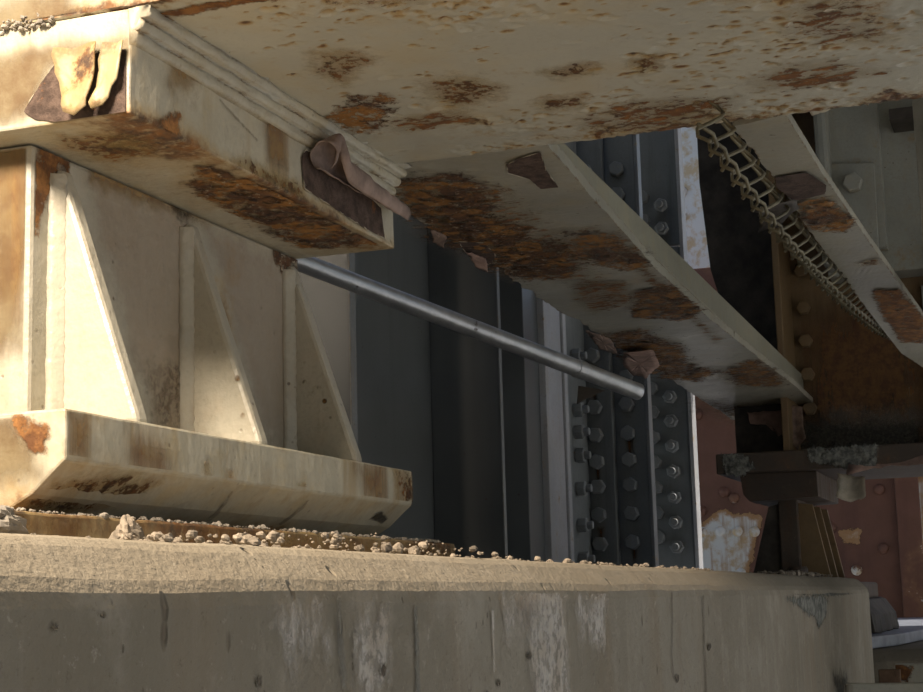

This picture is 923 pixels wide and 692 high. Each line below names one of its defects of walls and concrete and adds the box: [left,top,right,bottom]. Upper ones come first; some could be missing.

corrosion [160,0,279,17]
peeling [24,39,126,122]
corrosion [35,149,70,237]
peeling [302,133,411,239]
peeling [507,152,559,189]
corrosion [394,171,788,387]
corrosion [700,289,923,450]
corrosion [0,414,50,478]
peeling [701,509,763,573]
damp [359,612,388,692]
damp [503,593,568,692]
damp [578,593,605,647]